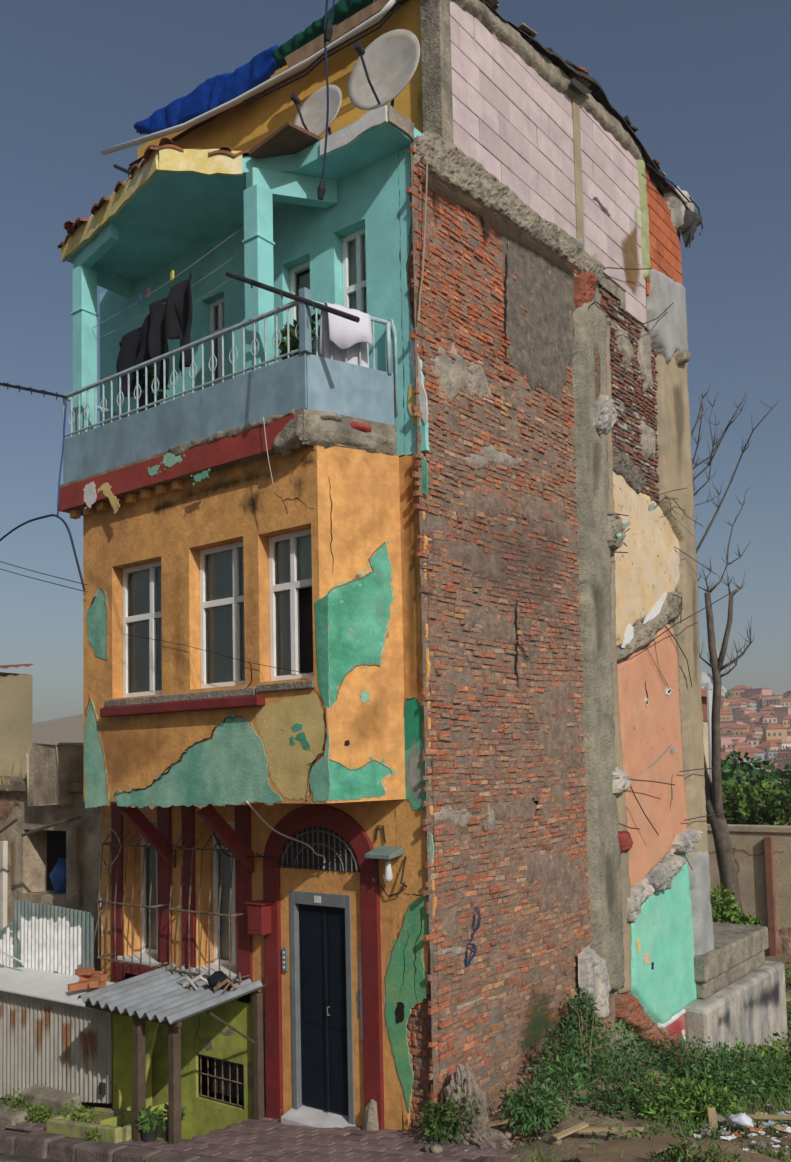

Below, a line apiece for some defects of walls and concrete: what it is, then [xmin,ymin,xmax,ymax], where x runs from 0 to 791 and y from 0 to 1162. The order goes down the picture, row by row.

peeling [191,469,211,485]
spalling [148,409,395,476]
crack [277,476,334,563]
spalling [606,512,630,553]
spalling [593,344,702,526]
peeling [84,541,431,811]
crack [515,600,530,687]
corrosion [0,1007,96,1065]
peeling [383,895,433,1113]